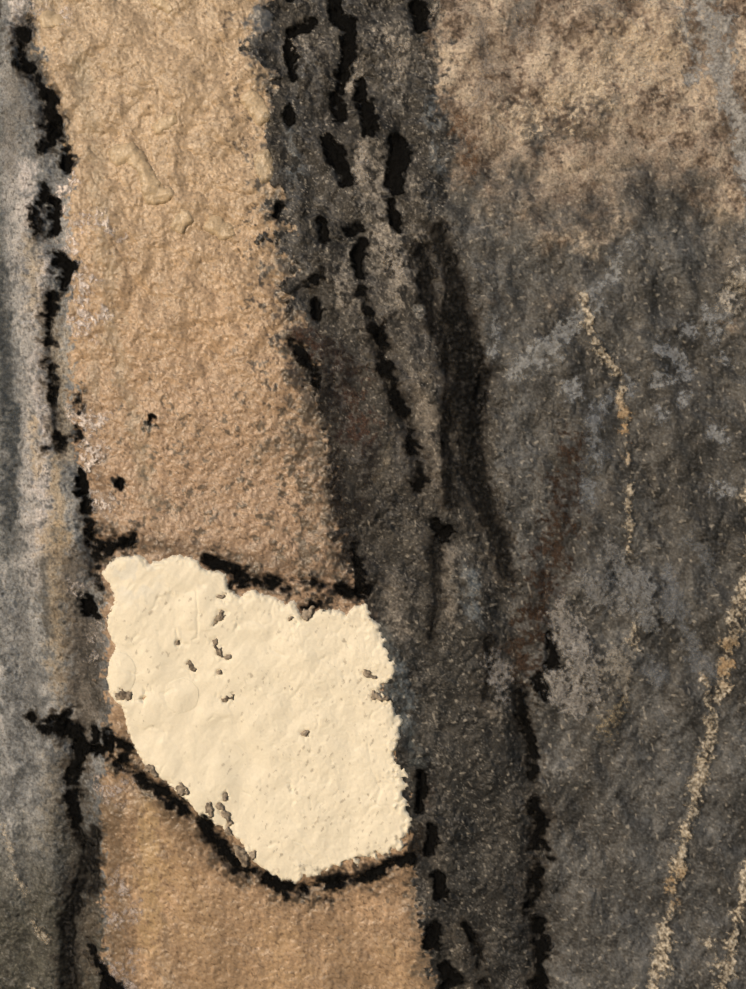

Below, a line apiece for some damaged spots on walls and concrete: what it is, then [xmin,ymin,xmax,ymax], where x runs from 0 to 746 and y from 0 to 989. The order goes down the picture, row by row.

crack [10,17,64,154]
crack [27,206,43,239]
crack [292,265,324,293]
crack [39,290,85,453]
crack [288,337,320,391]
crack [353,221,513,582]
crack [76,493,136,591]
crack [200,542,371,615]
crack [426,536,444,640]
crack [480,634,555,989]
crack [460,921,489,989]